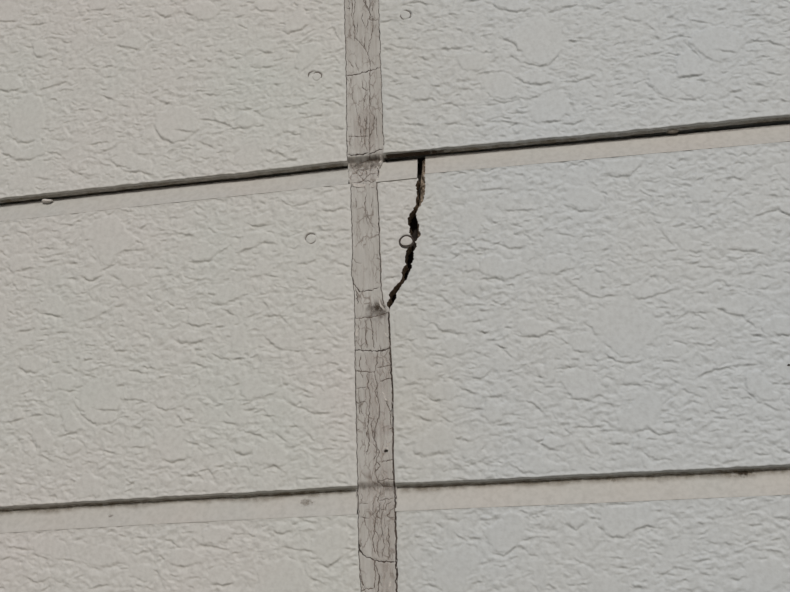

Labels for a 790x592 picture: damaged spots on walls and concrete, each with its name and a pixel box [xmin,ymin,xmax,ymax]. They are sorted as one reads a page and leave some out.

crack [344,0,426,592]